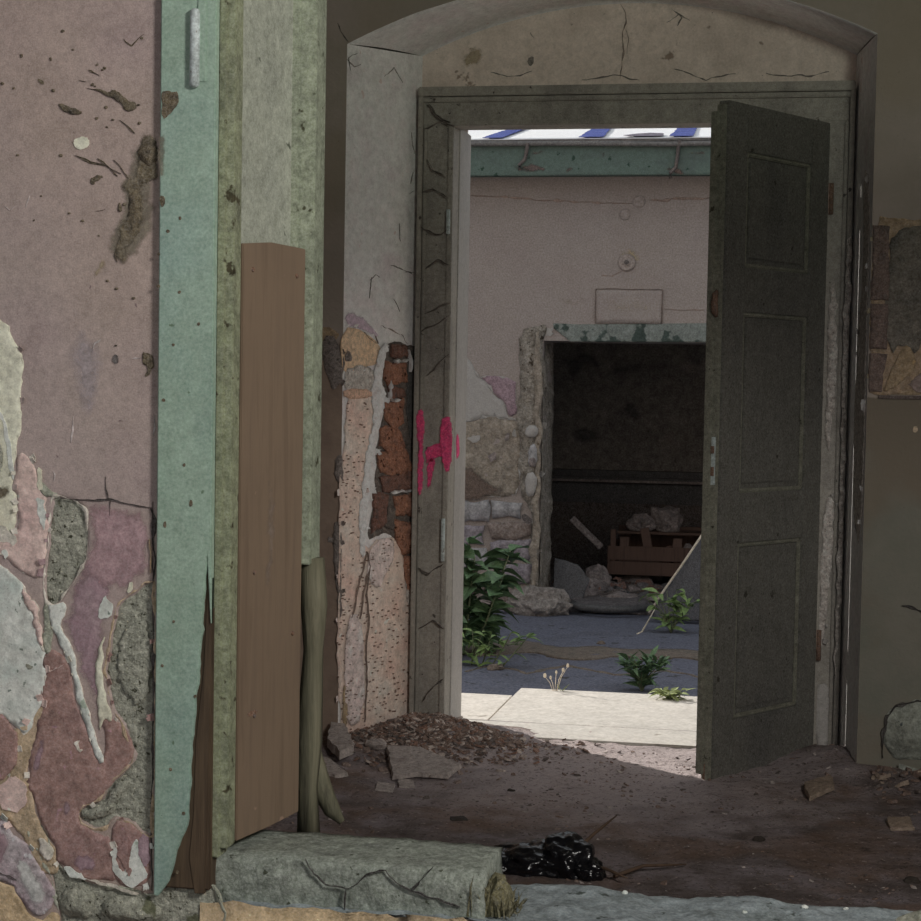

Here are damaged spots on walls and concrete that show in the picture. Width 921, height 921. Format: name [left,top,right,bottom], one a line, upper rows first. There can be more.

crack [620,5,629,77]
crack [60,477,157,581]
peeling [0,320,227,921]
crack [149,606,157,800]
flaking render [322,313,415,622]
flaking render [465,325,554,587]
flaking render [816,170,921,745]
crack [305,859,460,910]